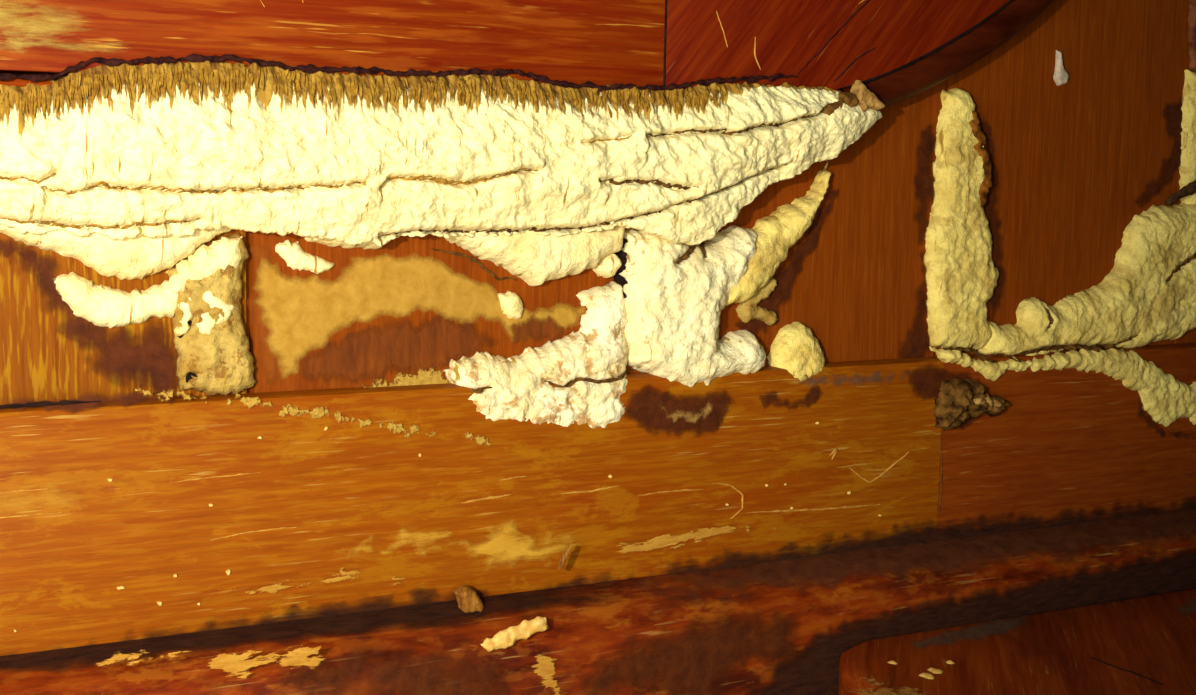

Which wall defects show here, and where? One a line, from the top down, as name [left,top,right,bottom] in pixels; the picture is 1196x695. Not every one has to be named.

water stain [737,191,838,334]
water stain [914,127,935,259]
water stain [980,122,1004,313]
water stain [1137,100,1183,206]
water stain [0,242,178,413]
water stain [303,315,491,382]
water stain [511,317,564,341]
water stain [900,283,969,399]
water stain [626,386,730,435]
peeling [97,650,191,666]
peeling [208,646,324,678]
peeling [532,655,560,695]